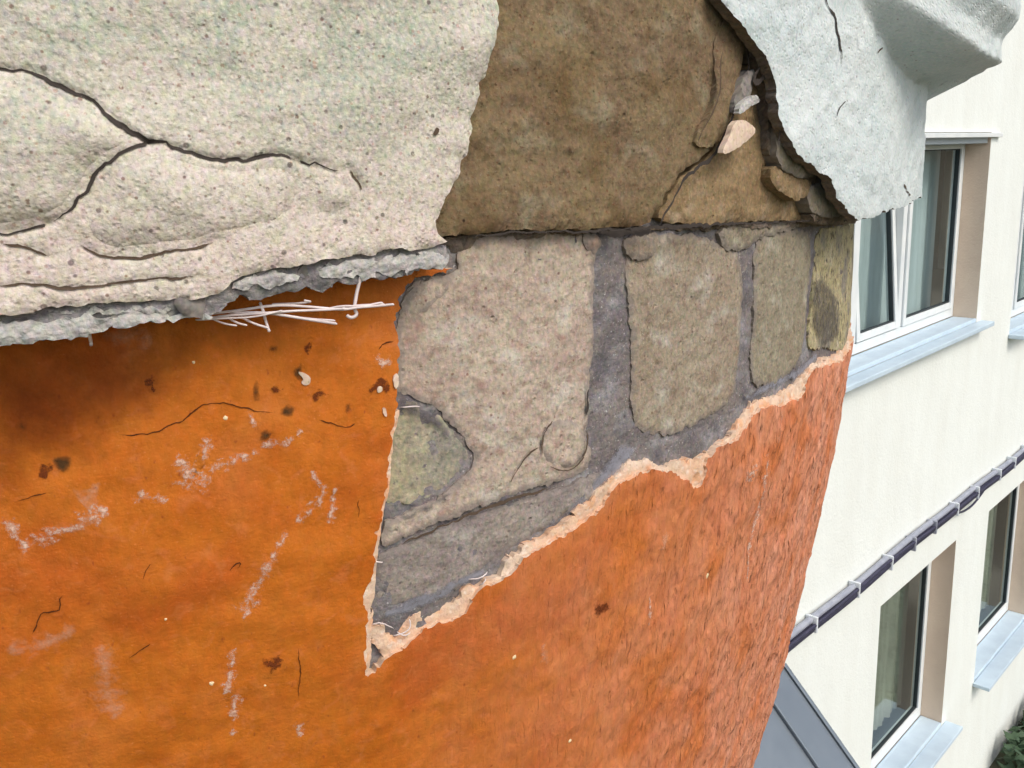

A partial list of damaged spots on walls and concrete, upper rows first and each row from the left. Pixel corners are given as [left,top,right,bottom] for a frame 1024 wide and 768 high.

crack [826,0,842,62]
crack [0,67,362,257]
spalling [0,0,856,675]
crack [126,402,262,436]
efflorescence [5,506,107,548]